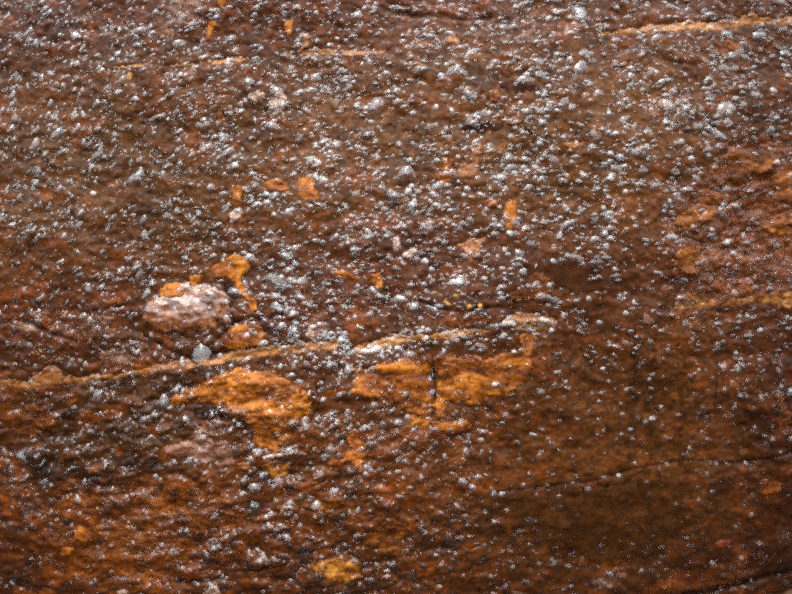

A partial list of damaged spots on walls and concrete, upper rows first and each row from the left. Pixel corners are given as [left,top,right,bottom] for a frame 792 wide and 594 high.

rust [441,309,503,331]
rust [346,412,478,473]